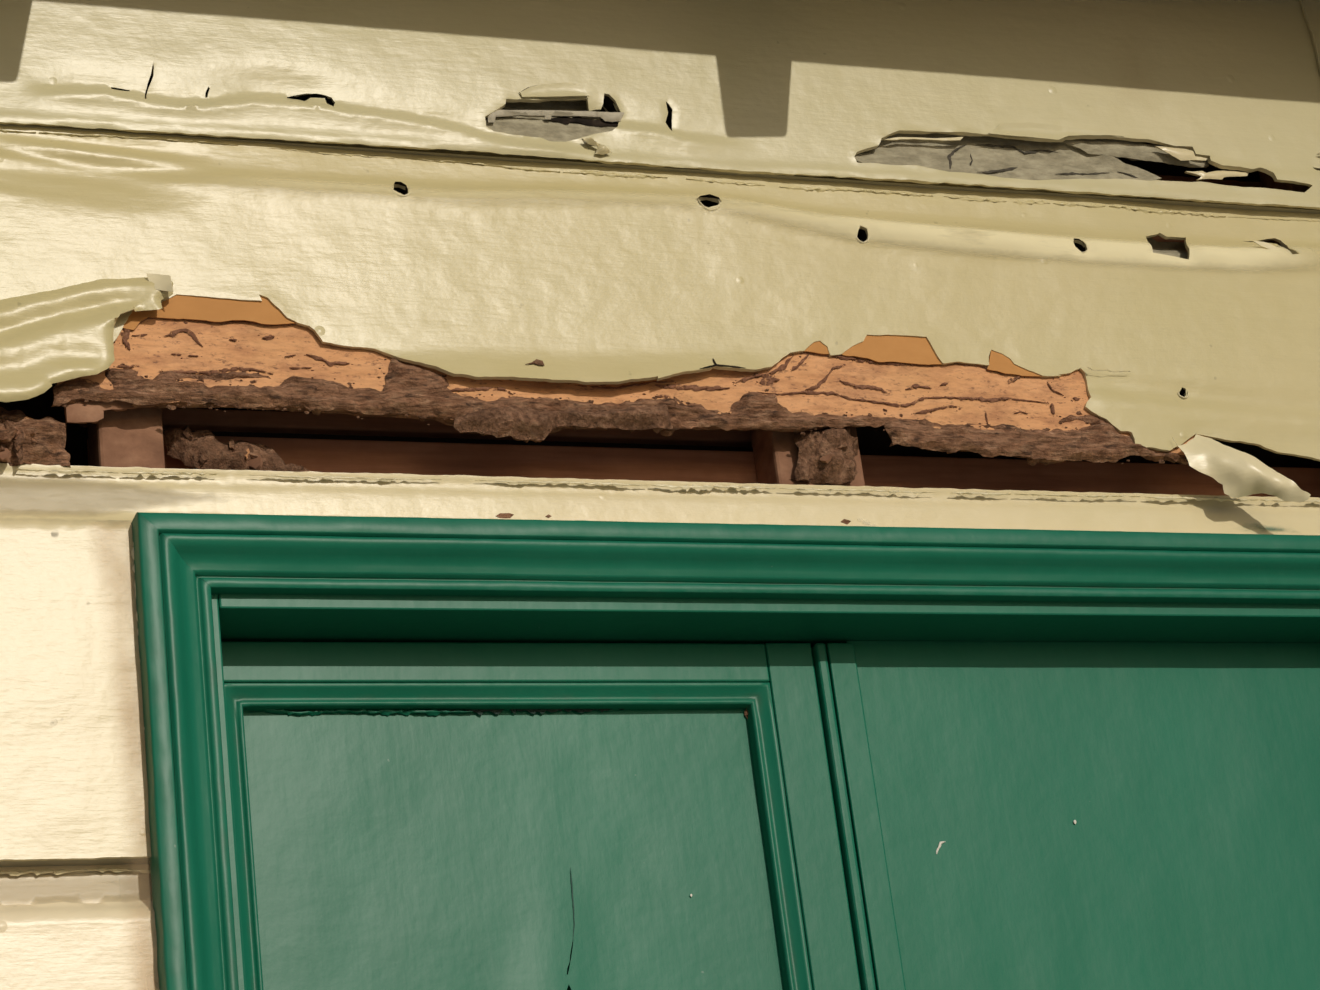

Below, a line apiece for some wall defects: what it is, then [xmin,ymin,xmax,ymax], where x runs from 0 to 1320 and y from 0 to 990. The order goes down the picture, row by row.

peeling [520,82,589,98]
peeling [988,122,1124,141]
peeling [1155,146,1207,161]
peeling [0,273,174,462]
peeling [229,439,263,470]
peeling [1172,434,1311,503]
crack [568,867,576,937]